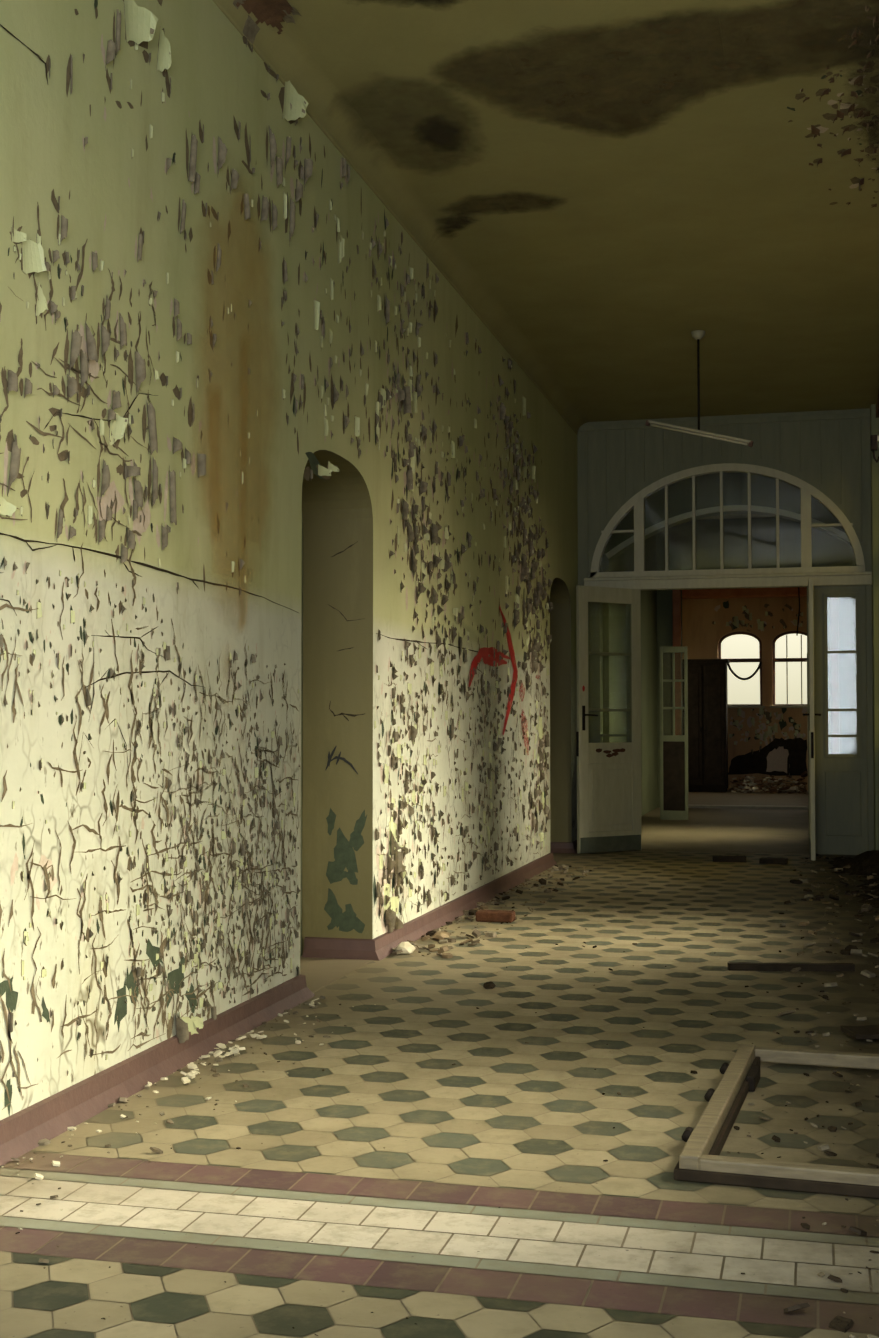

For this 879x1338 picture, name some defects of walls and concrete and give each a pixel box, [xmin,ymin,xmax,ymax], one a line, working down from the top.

peeling [66,53,85,96]
peeling [89,0,172,122]
leakage [439,0,879,141]
peeling [787,6,879,207]
leakage [440,194,559,234]
peeling [150,0,553,934]
crack [0,533,298,613]
peeling [0,189,301,1116]
crack [329,605,478,652]